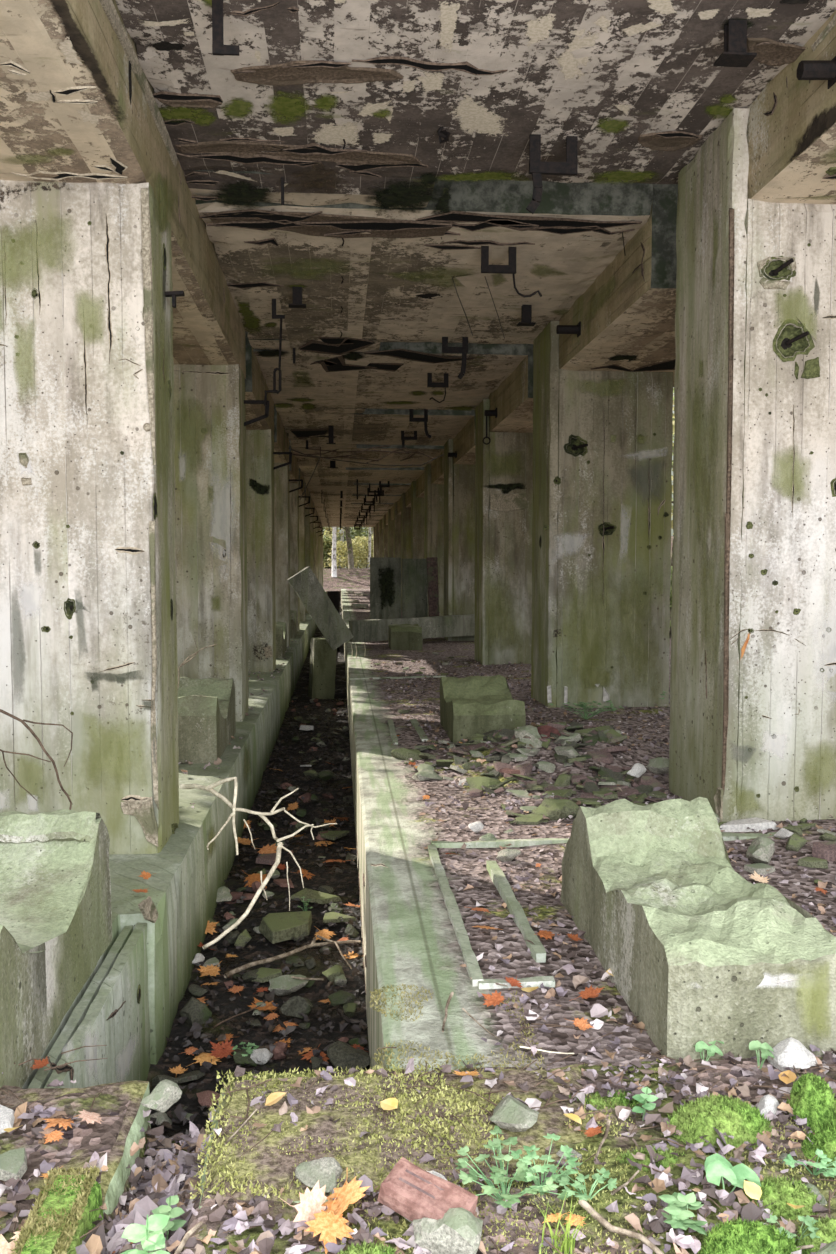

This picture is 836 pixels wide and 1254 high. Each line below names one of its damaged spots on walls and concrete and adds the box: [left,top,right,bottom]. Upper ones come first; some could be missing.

crack [352,56,508,76]
peeling [438,0,460,53]
peeling [524,0,677,80]
peeling [698,9,719,20]
peeling [745,7,775,19]
spalling [747,37,806,67]
peeling [437,88,508,144]
spalling [638,131,703,151]
leakage [78,297,101,339]
leakage [16,329,33,388]
leakage [12,600,24,688]
leakage [76,600,85,647]